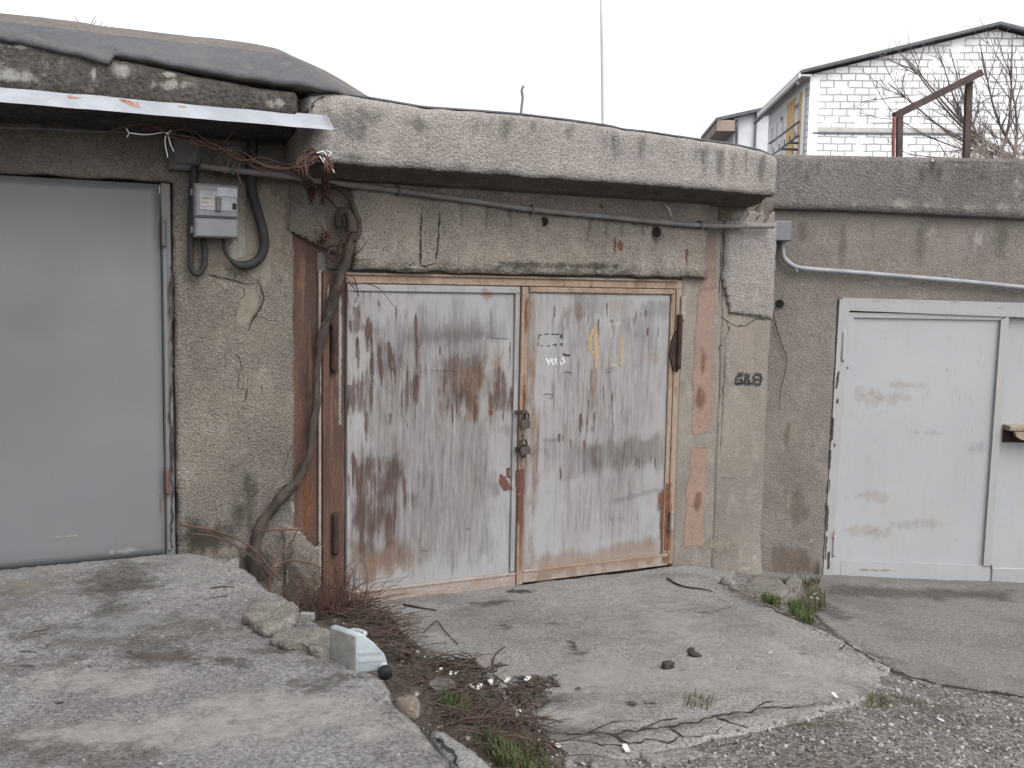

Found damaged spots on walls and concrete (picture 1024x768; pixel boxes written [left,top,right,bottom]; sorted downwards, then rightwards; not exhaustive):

crack [419,212,441,267]
spalling [718,199,774,223]
crack [208,235,308,332]
corrosion [350,315,420,438]
corrosion [439,343,526,423]
corrosion [558,373,613,466]
corrosion [657,484,671,563]
crack [768,606,1024,698]
crack [538,700,822,746]